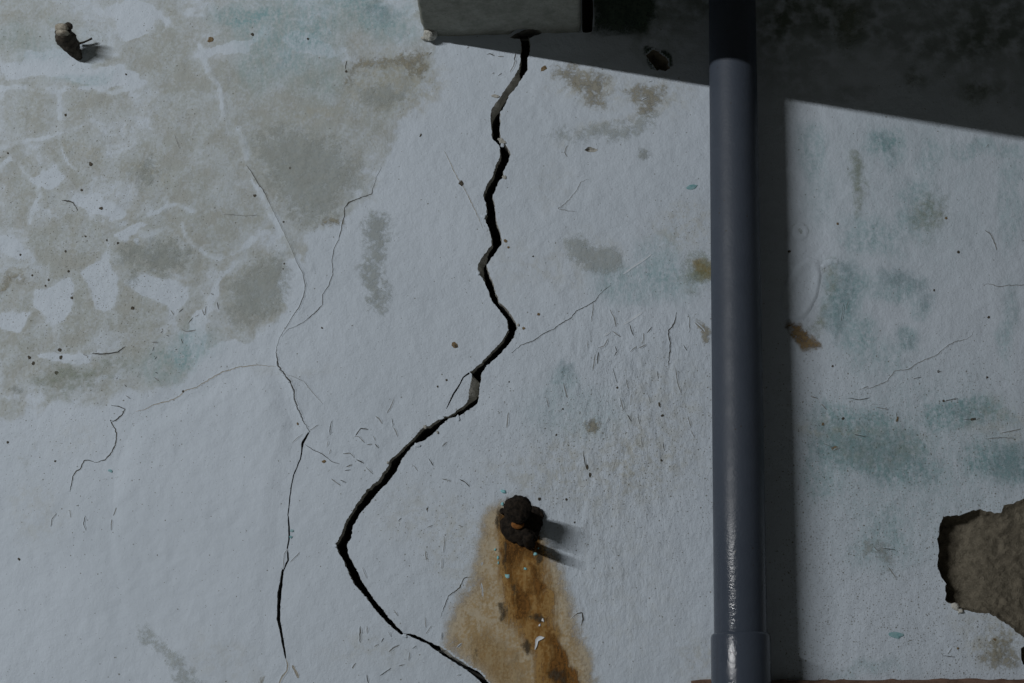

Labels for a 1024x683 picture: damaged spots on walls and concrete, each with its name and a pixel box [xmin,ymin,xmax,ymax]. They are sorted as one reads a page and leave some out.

crack [62,199,78,211]
crack [70,165,382,683]
crack [333,29,611,683]
corrosion [445,490,592,683]
spalling [937,499,1024,665]